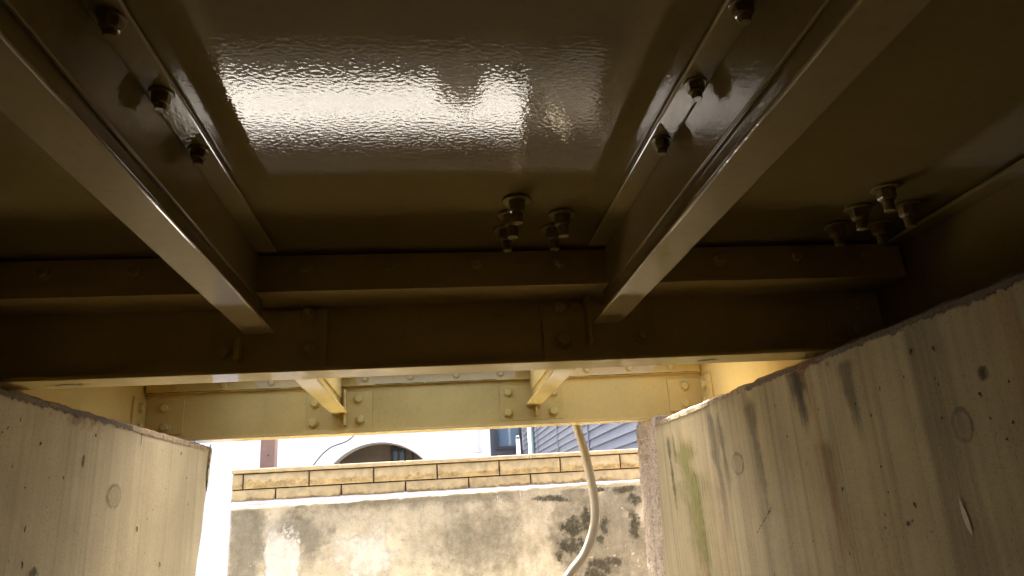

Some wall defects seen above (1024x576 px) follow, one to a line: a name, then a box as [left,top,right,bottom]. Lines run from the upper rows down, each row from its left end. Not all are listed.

water stain [787,371,806,423]
water stain [534,486,647,576]